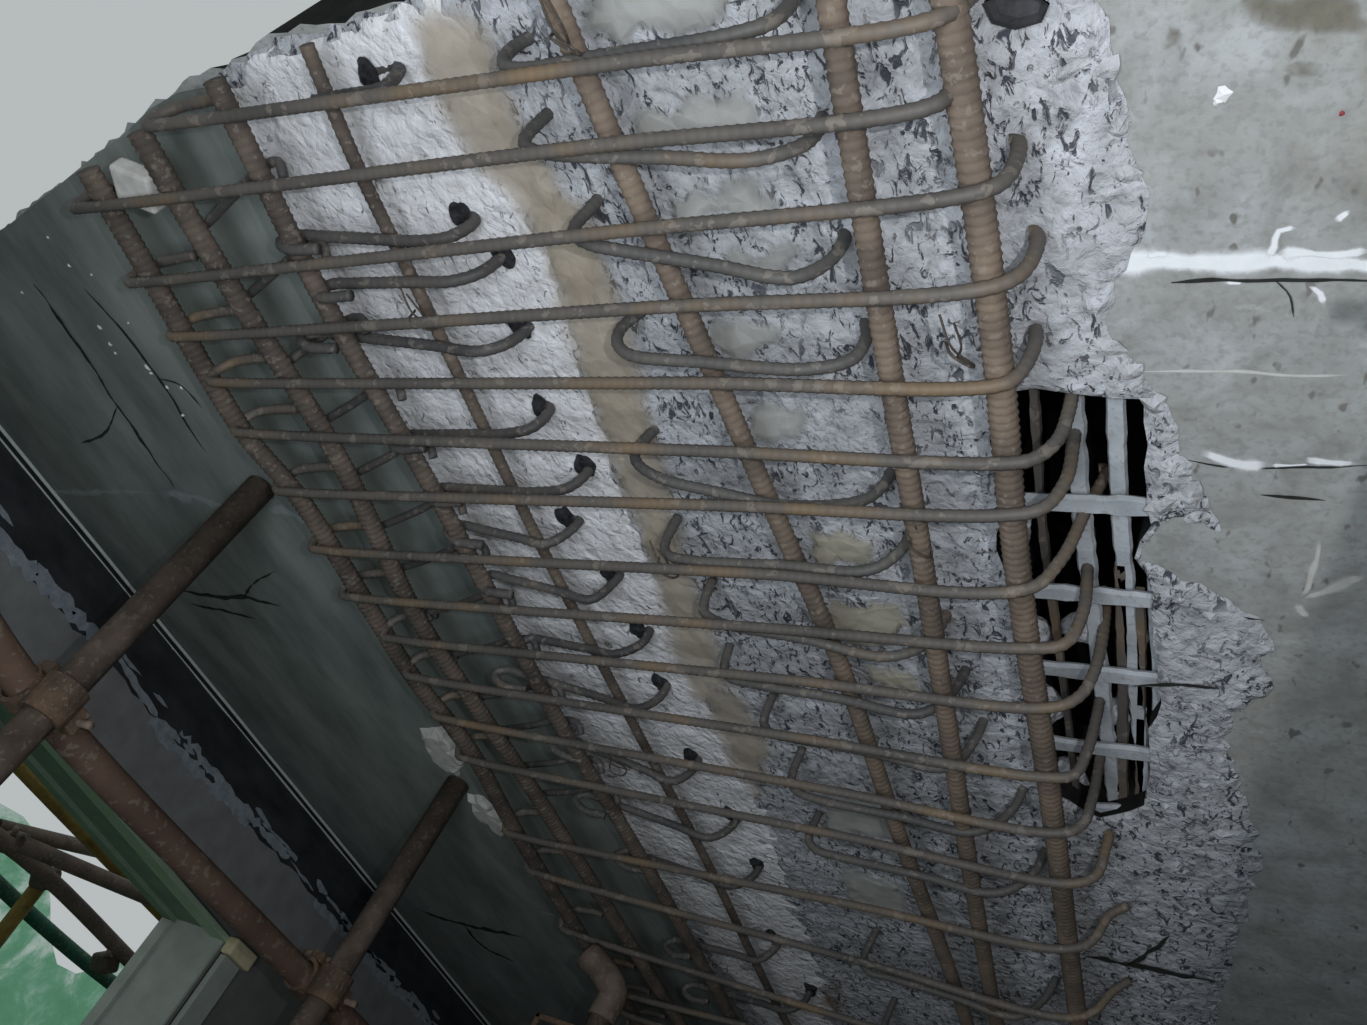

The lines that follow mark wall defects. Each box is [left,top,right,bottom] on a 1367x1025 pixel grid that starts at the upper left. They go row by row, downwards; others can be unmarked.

damp [1251,0,1355,27]
peeling [0,441,130,640]
crack [184,571,279,619]
spalling [76,128,688,1025]
rust [420,19,765,783]
spalling [202,0,1274,1025]